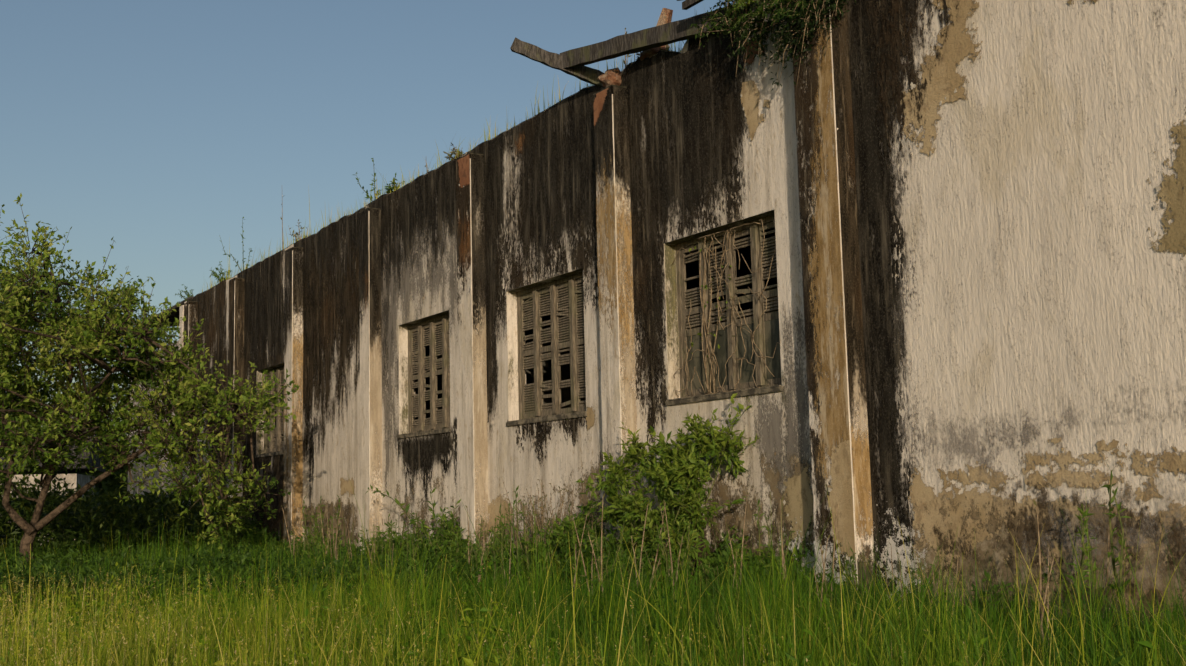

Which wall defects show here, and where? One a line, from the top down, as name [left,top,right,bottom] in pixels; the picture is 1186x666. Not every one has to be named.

peeling [740,79,770,145]
peeling [900,0,982,156]
peeling [1147,107,1186,260]
leakage [183,26,752,556]
leakage [639,0,1186,615]
peeling [873,437,1186,611]